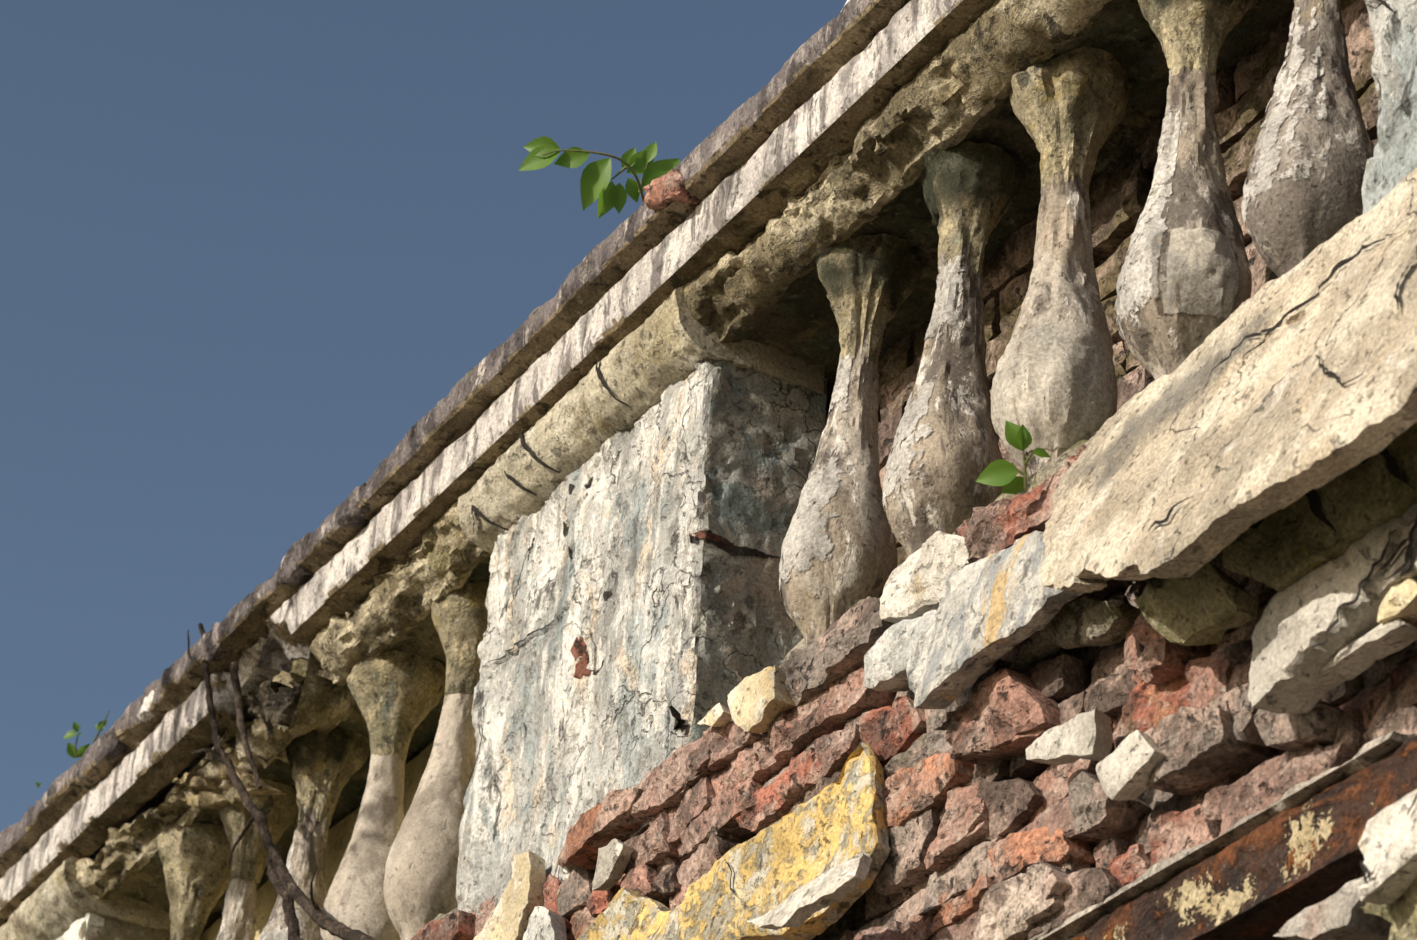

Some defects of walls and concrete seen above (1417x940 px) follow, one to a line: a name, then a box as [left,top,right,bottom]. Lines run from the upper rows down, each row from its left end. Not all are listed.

crack [1205,213,1417,386]
crack [595,357,632,408]
spalling [337,483,371,528]
spalling [280,559,313,585]
crack [689,530,781,558]
crack [1297,447,1417,667]
spalling [136,690,155,724]
spalling [242,657,309,738]
spalling [172,764,286,810]
peeling [286,835,296,874]
corrosion [1286,838,1317,871]
peeling [258,916,306,940]